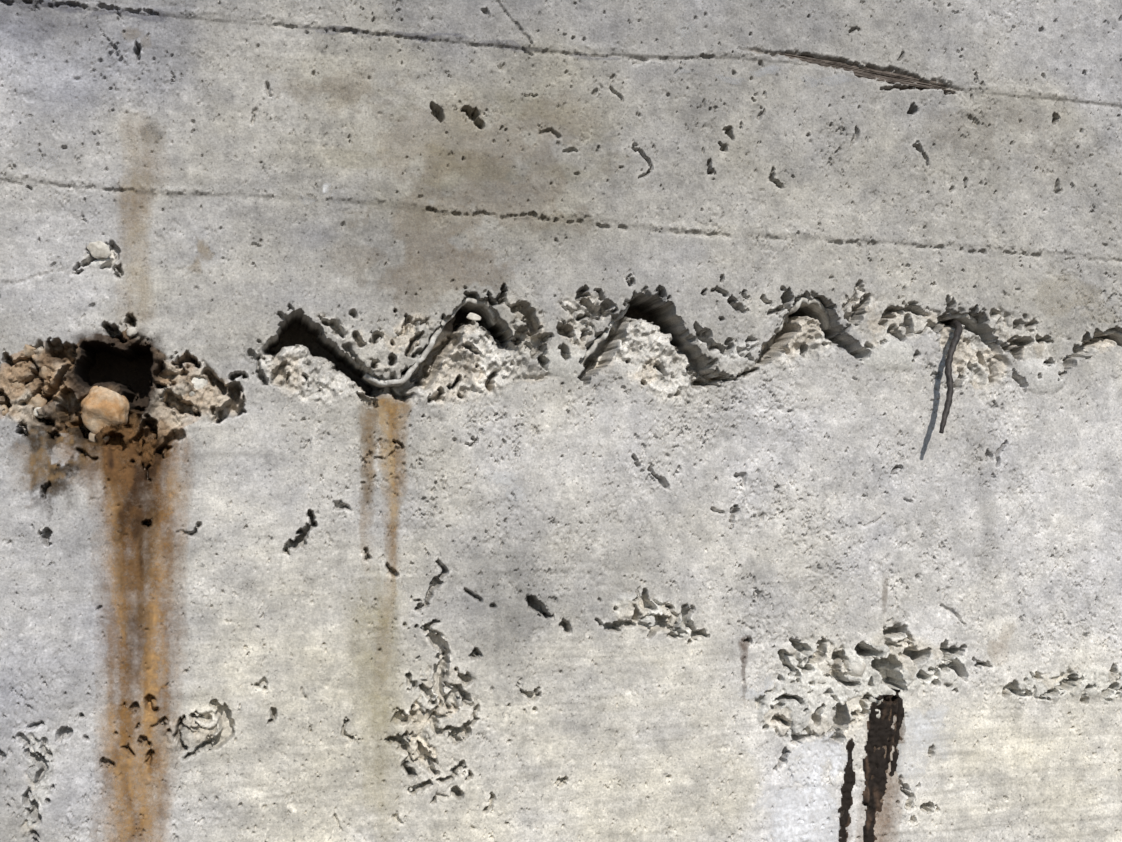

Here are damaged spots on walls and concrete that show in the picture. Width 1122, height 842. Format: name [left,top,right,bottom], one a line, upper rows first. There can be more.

crack [0,0,161,17]
crack [272,0,716,64]
spalling [0,284,561,483]
spalling [576,285,871,413]
spalling [931,305,1014,396]
spalling [1057,326,1122,381]
spalling [39,482,50,502]
rust [362,398,407,555]
rust [26,415,176,842]
hole [752,621,993,772]
damp [767,688,943,842]